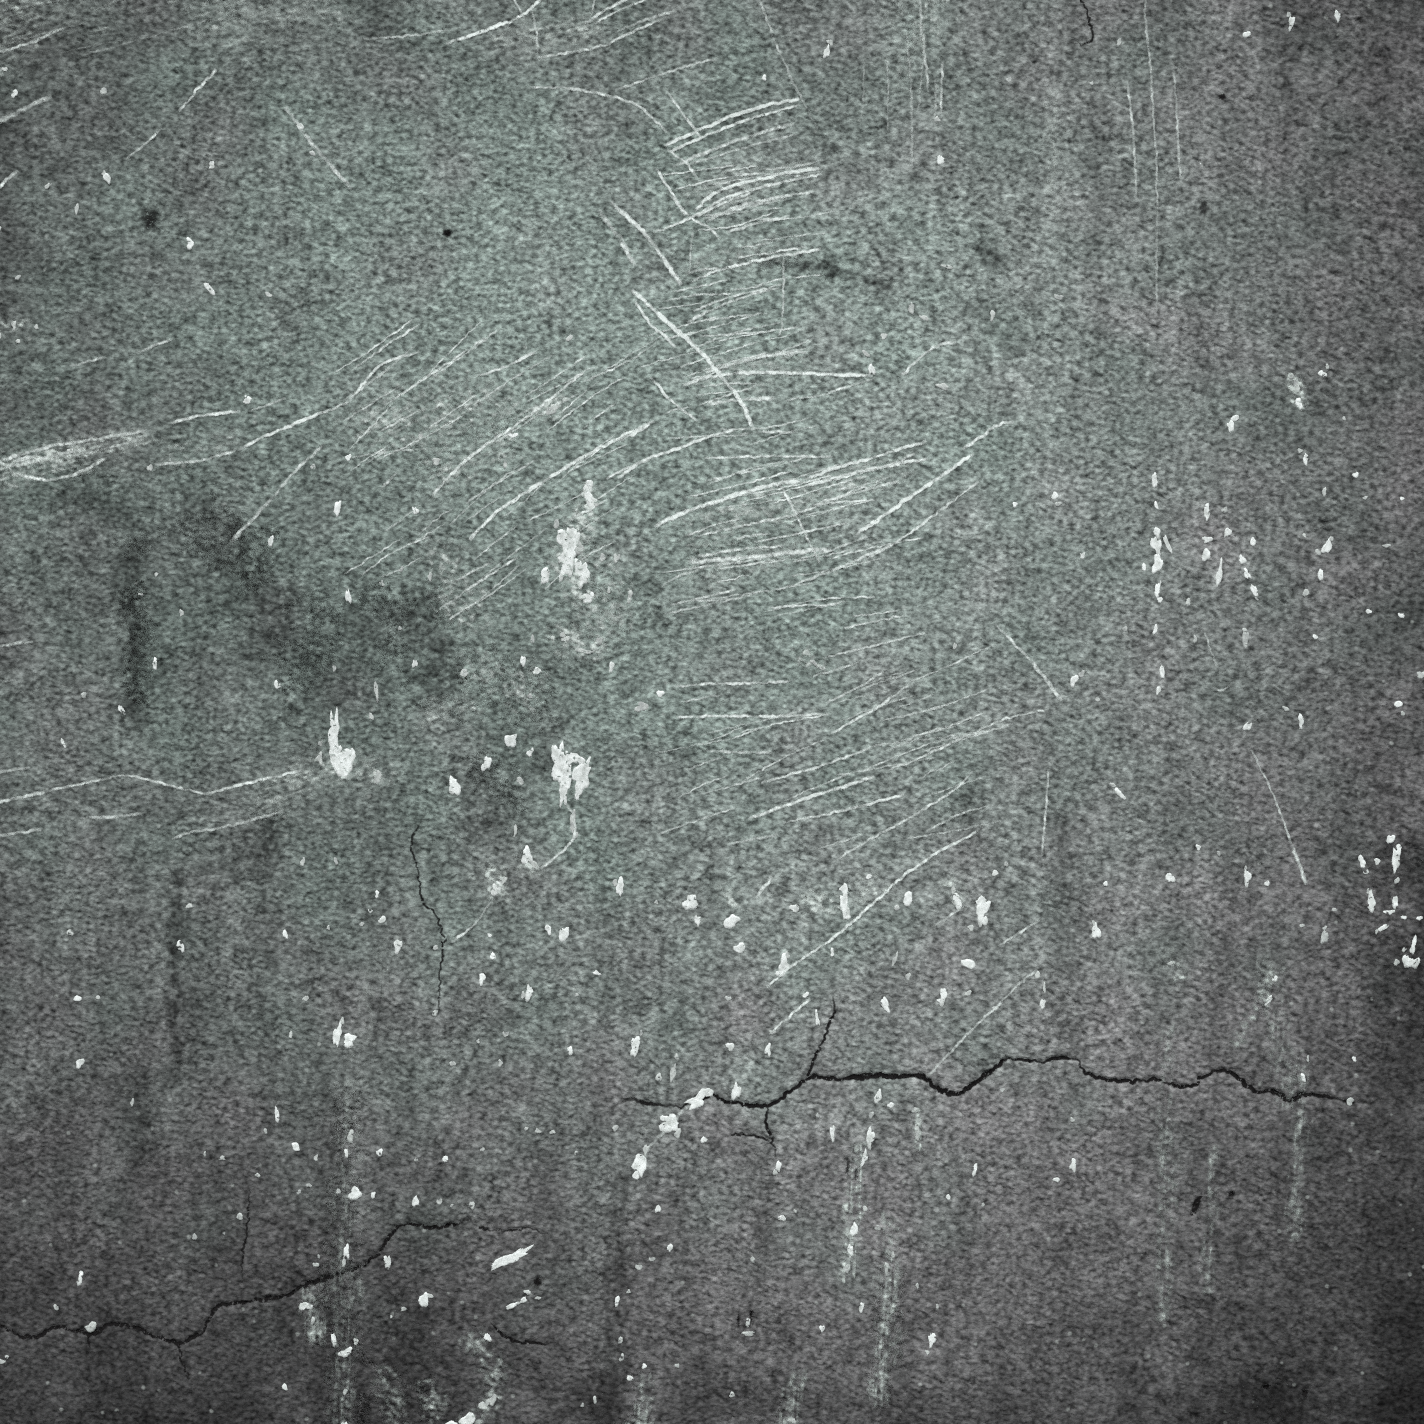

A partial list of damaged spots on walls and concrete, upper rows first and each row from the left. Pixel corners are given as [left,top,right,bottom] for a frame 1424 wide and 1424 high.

crack [627,1000,1353,1152]
crack [0,1202,546,1377]